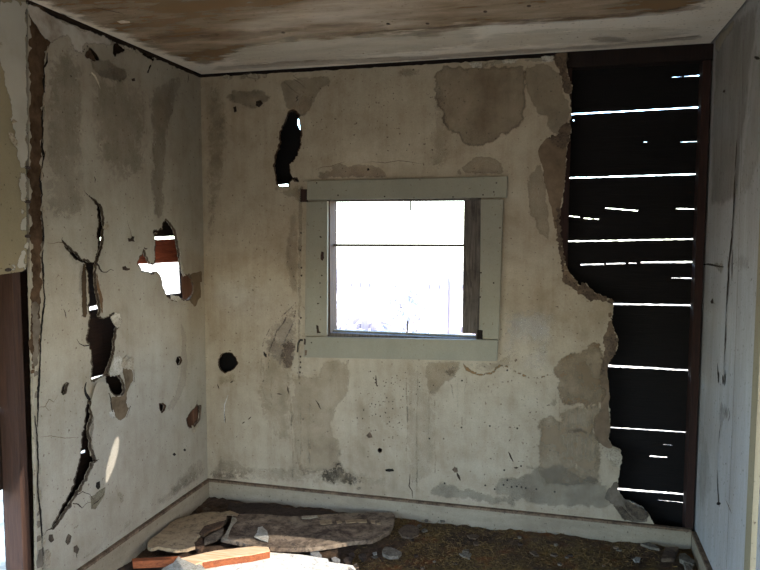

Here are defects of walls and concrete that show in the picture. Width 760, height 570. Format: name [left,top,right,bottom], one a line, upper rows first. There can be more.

peeling [541,52,573,94]
spalling [273,77,306,189]
crack [51,177,114,319]
peeling [27,4,189,569]
spalling [122,219,202,306]
peeling [538,122,622,469]
crack [43,382,99,531]
leakage [322,462,352,485]
spalling [605,482,649,522]